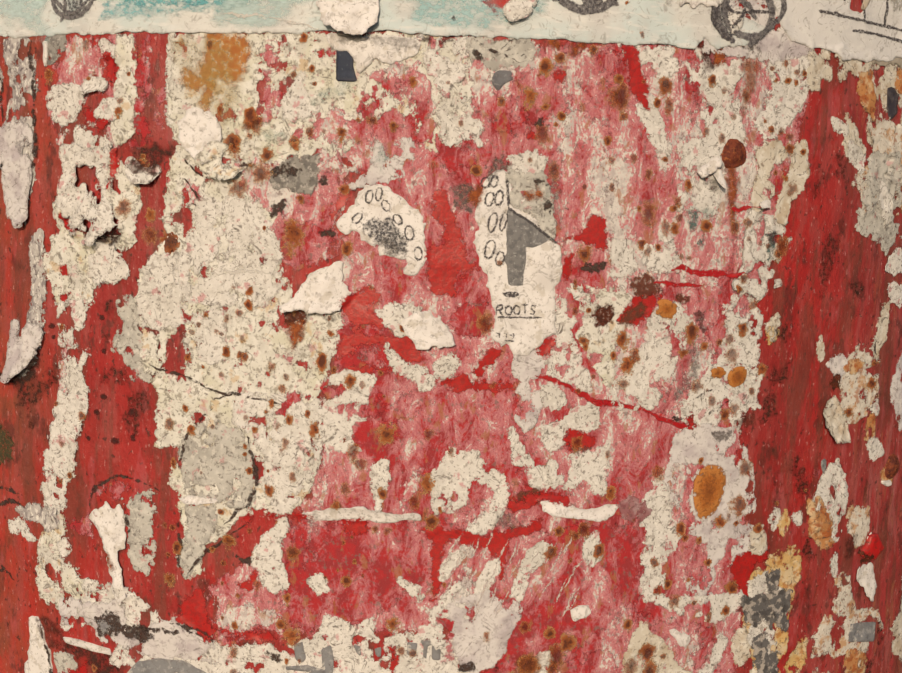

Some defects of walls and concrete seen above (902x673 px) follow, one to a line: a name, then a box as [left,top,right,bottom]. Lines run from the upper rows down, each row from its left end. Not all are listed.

corrosion [183,33,250,116]
corrosion [223,107,262,158]
peeling [806,49,902,487]
peeling [0,32,176,613]
corrosion [610,331,640,388]
corrosion [678,323,754,395]
peeling [369,447,511,536]
corrosion [693,457,746,528]
peeling [730,456,902,673]
peeling [24,616,119,673]
peeling [437,540,553,673]
corrosion [511,627,577,673]